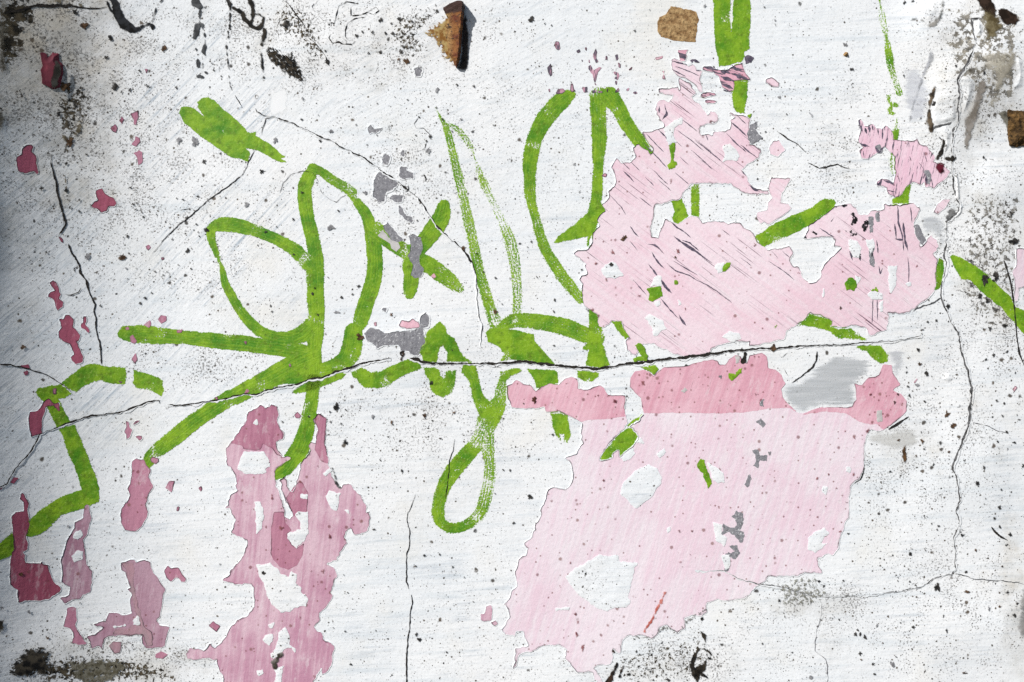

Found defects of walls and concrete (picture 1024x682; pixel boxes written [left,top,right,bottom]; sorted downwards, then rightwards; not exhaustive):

corrosion [425,18,460,67]
peeling [16,144,39,174]
peeling [69,188,117,213]
peeling [48,280,90,364]
crack [0,96,923,488]
peeling [480,4,950,682]
crack [695,17,1024,682]
peeling [0,477,187,659]
peeling [120,457,175,532]
peeling [185,402,375,682]
crack [406,497,415,682]